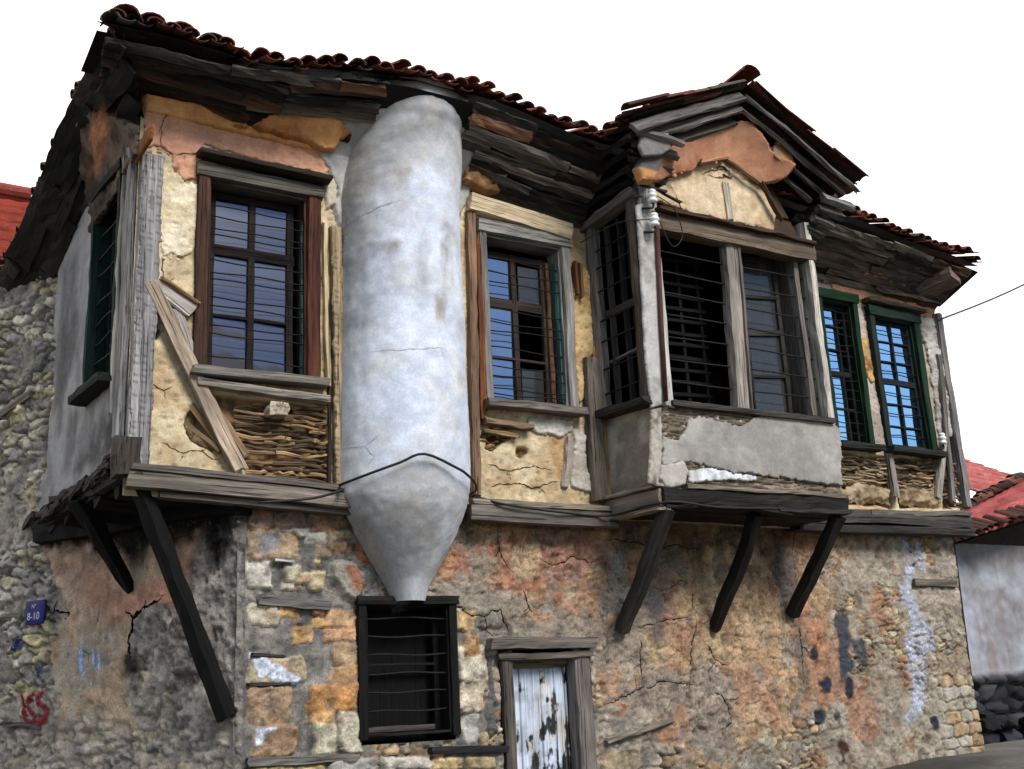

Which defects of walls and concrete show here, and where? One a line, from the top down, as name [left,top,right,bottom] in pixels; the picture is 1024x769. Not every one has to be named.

flaking render [144,112,351,262]
flaking render [461,165,507,197]
flaking render [652,121,796,185]
crack [162,442,221,462]
crack [489,464,559,493]
flaking render [527,416,591,493]
flaking render [658,413,843,488]
water stain [206,519,230,562]
crack [541,538,699,565]
crack [457,533,533,636]
crack [125,595,163,658]
crack [604,580,740,735]